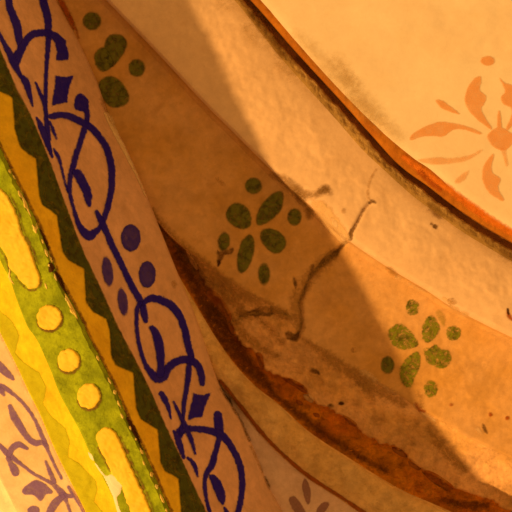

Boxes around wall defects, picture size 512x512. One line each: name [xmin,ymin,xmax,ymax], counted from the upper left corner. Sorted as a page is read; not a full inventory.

leakage [280,177,329,203]
crack [232,194,375,342]